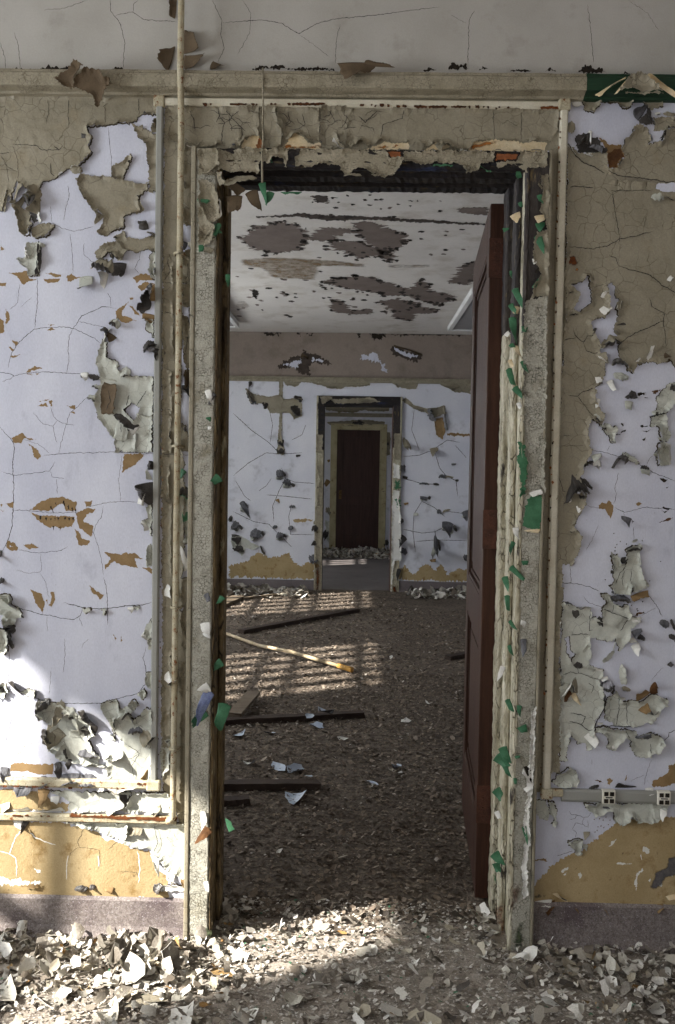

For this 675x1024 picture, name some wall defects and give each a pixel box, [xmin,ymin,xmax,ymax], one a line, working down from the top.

crack [0,100,92,263]
crack [110,1,175,68]
crack [190,108,404,142]
crack [212,0,474,63]
peeling [448,62,487,70]
peeling [578,64,603,73]
crack [566,145,675,354]
crack [0,280,182,704]
flaking render [0,59,214,898]
crack [233,413,314,546]
peeling [183,71,675,916]